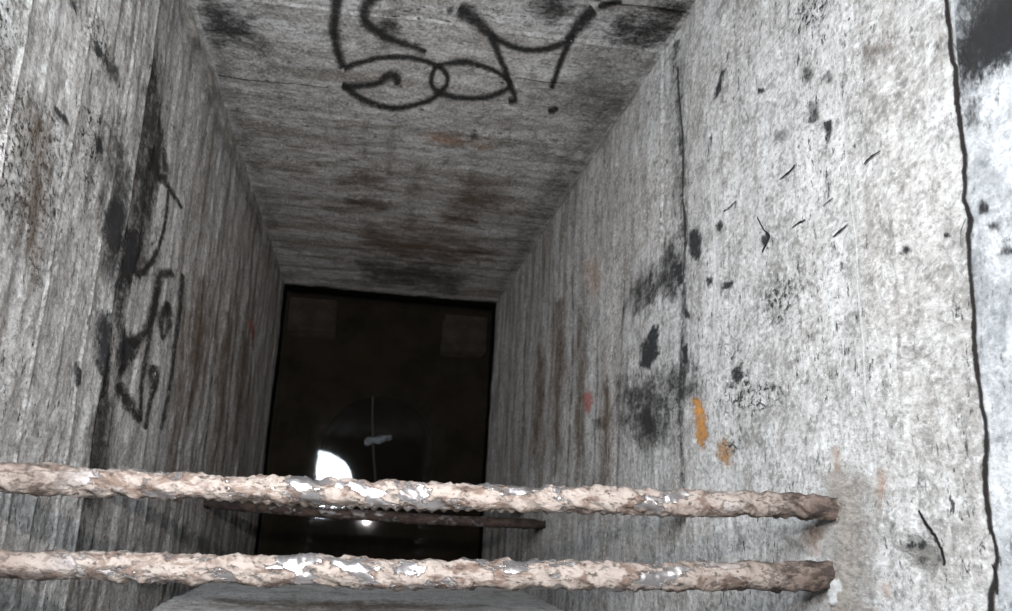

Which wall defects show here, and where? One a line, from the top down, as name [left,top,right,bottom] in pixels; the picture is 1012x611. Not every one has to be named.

crack [944,0,999,611]
rust [691,397,708,447]
rust [716,438,735,465]